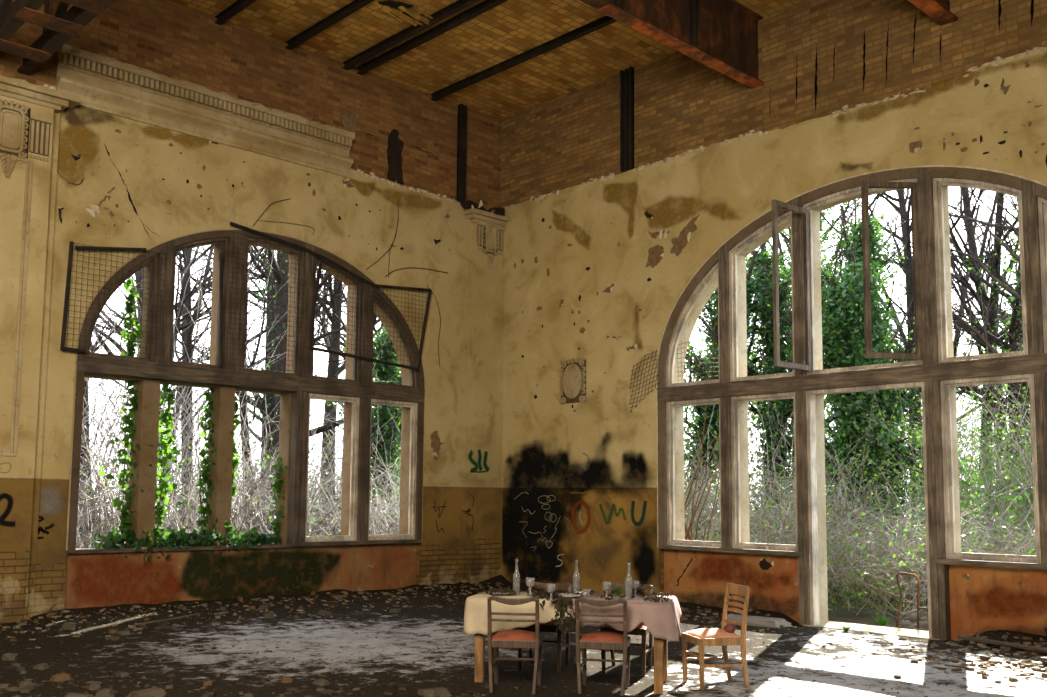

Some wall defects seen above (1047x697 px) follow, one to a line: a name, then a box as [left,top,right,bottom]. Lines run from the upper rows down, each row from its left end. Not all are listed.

spalling [909,127,924,153]
spalling [943,130,1008,155]
spalling [646,214,700,281]